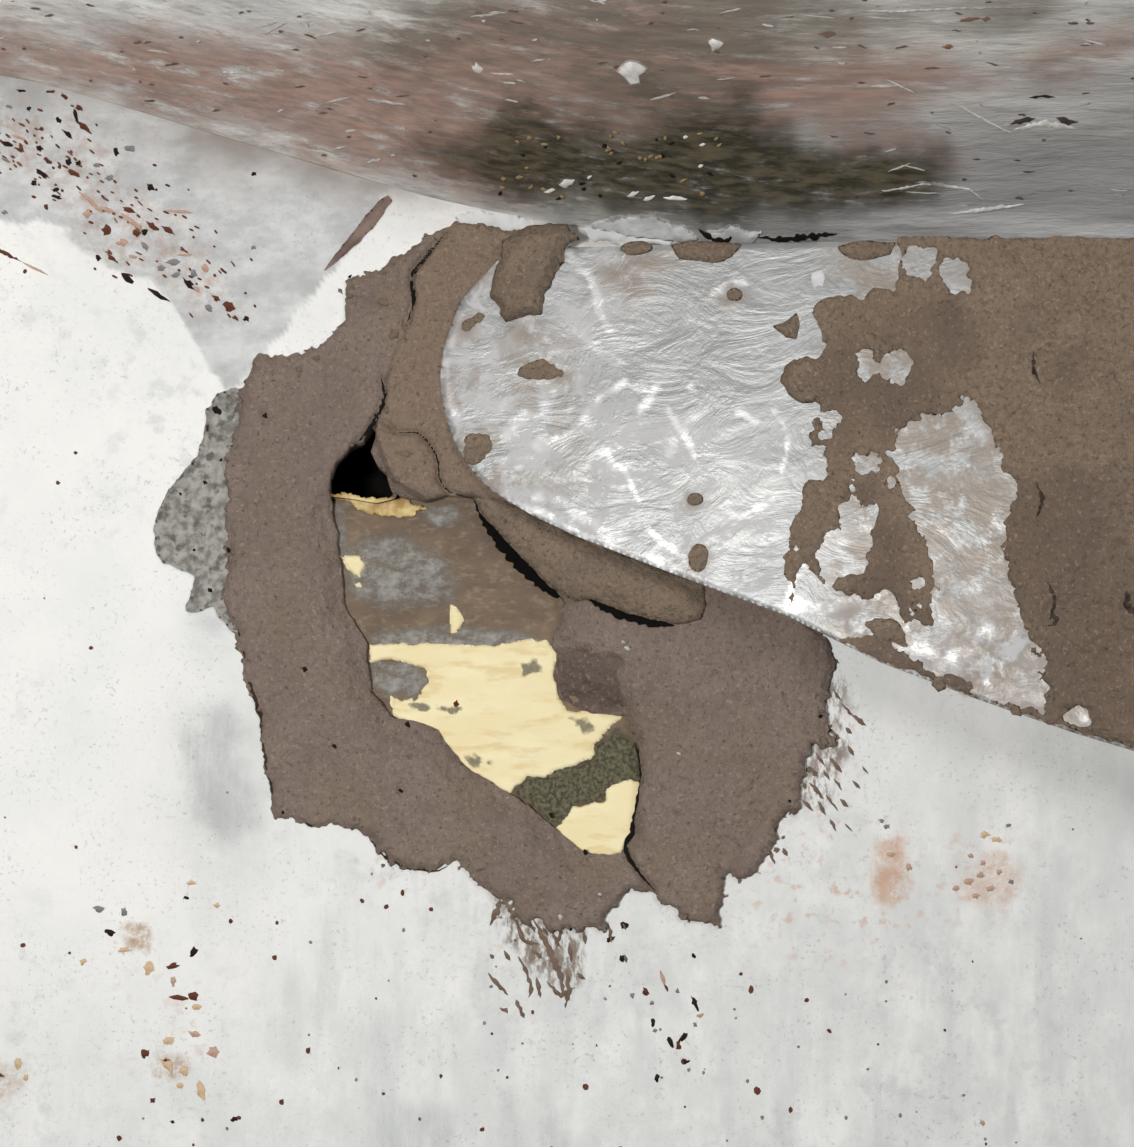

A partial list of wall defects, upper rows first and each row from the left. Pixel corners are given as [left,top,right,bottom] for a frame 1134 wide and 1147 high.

damp [0,0,953,224]
spalling [324,195,392,271]
flaking render [153,388,241,632]
crack [353,378,474,500]
flaking render [330,484,640,855]